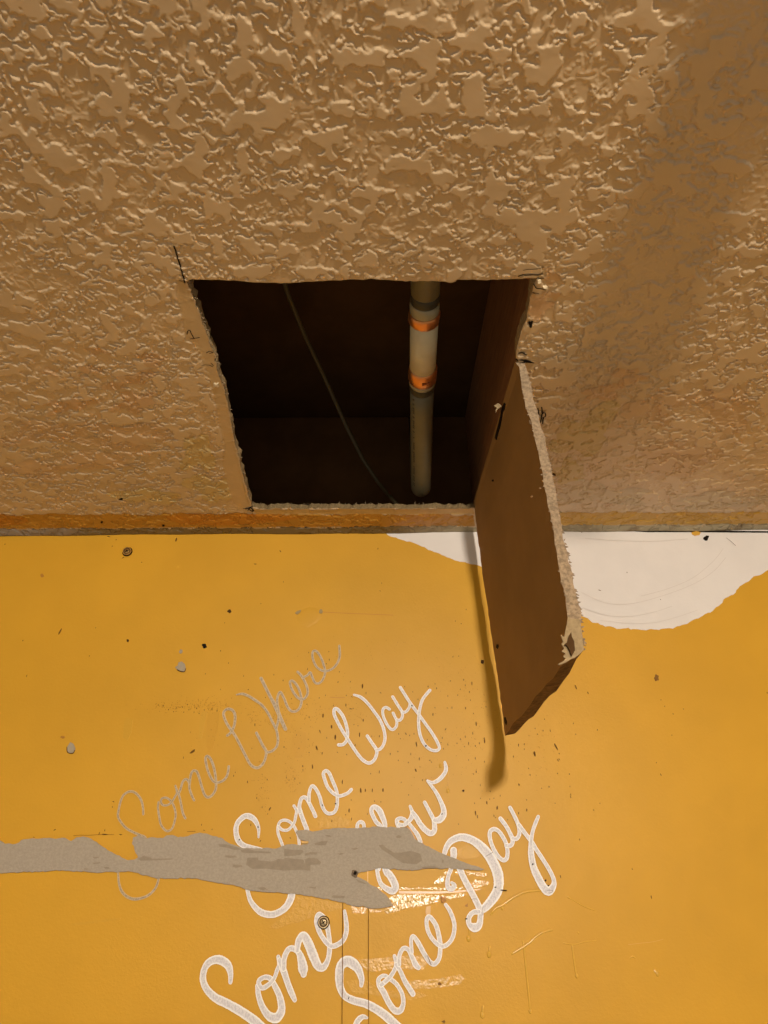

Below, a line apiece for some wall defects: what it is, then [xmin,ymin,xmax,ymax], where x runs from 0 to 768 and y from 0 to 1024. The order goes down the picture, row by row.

peeling [0,826,484,908]